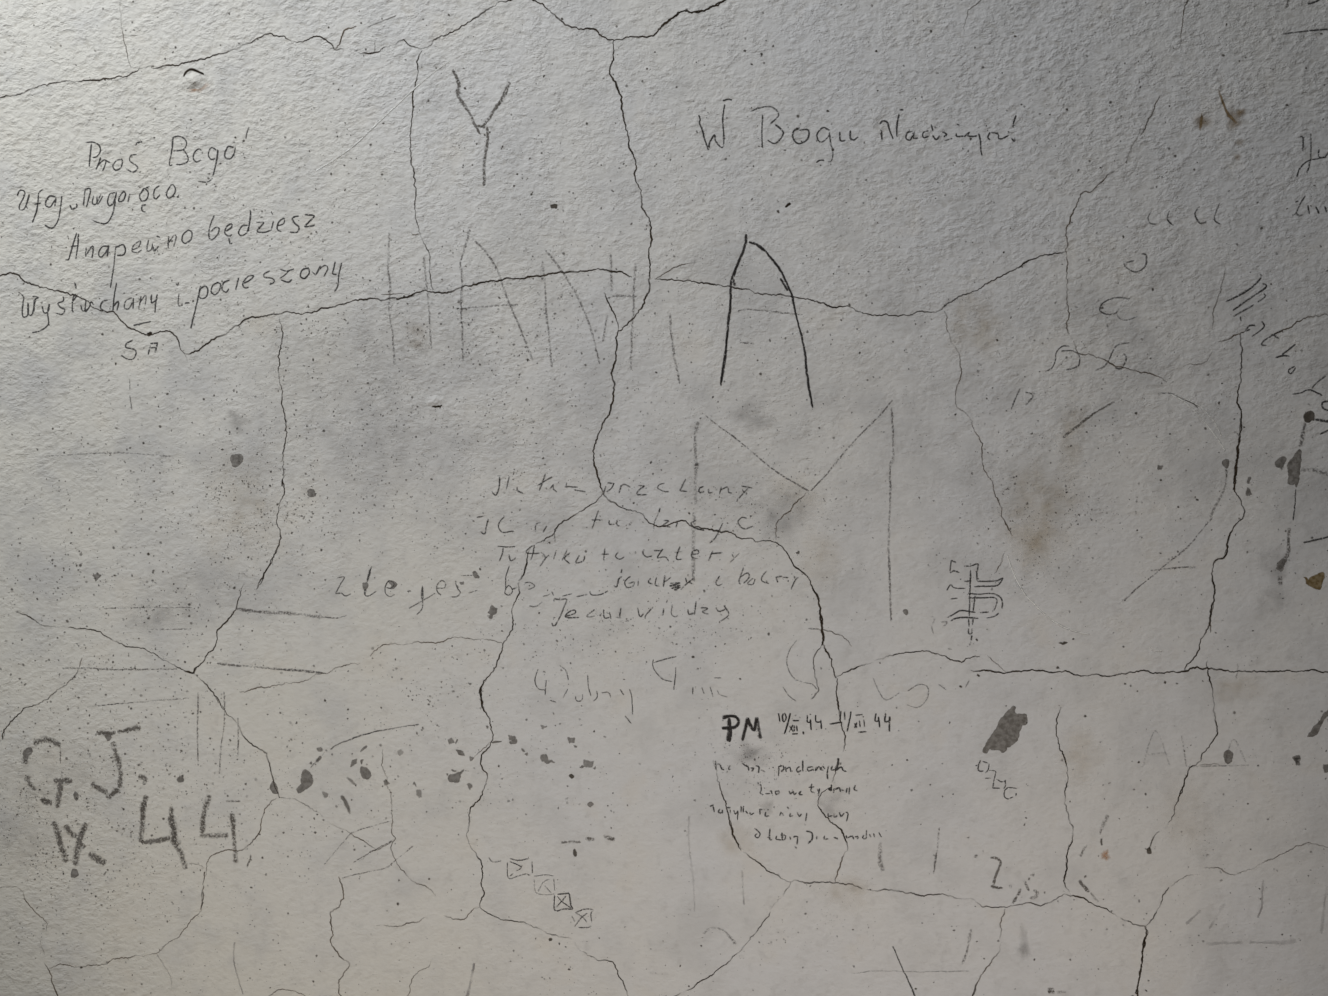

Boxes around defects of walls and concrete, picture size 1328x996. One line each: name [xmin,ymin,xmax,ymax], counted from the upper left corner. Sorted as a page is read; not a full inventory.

spalling [654,107,812,375]
crack [0,0,1159,819]
crack [892,291,1328,848]
crack [46,736,278,996]
crack [330,878,349,996]
crack [450,857,552,935]
crack [676,913,770,996]
crack [719,770,945,897]
spalling [983,705,1027,753]
crack [972,712,1306,996]